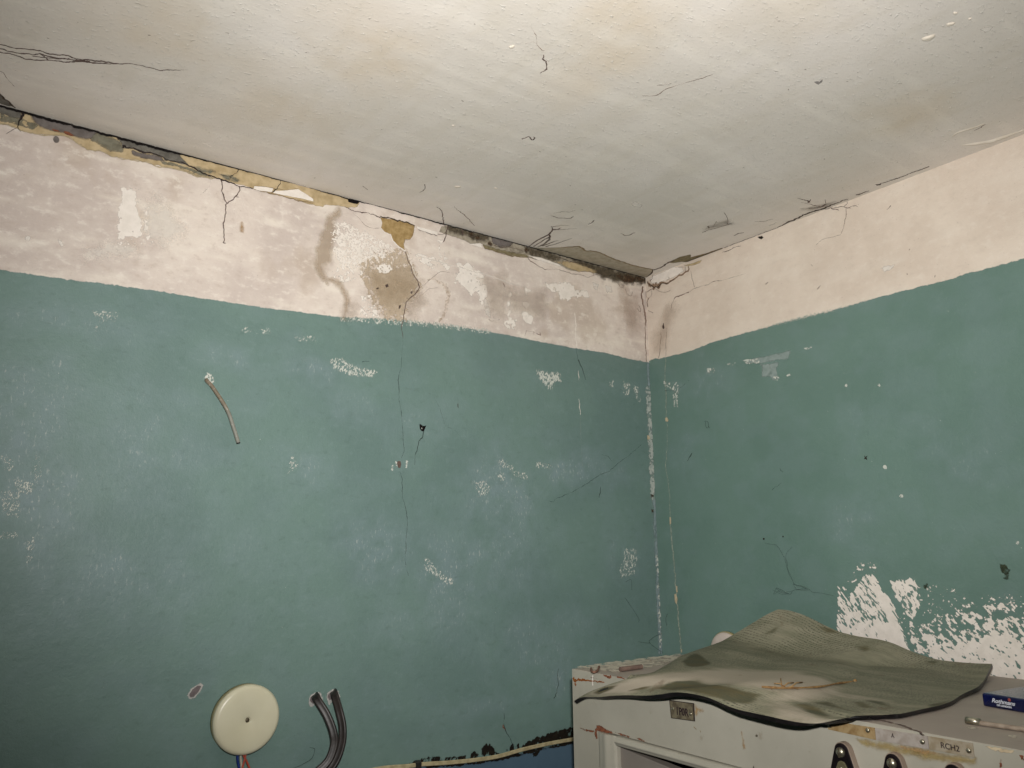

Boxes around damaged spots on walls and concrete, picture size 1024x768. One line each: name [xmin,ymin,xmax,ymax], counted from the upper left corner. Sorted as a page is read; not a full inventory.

flaking render [0,107,722,329]
crack [717,166,929,252]
damp [361,248,421,321]
crack [0,44,739,653]
peeling [744,359,791,381]
peeling [837,564,1024,679]